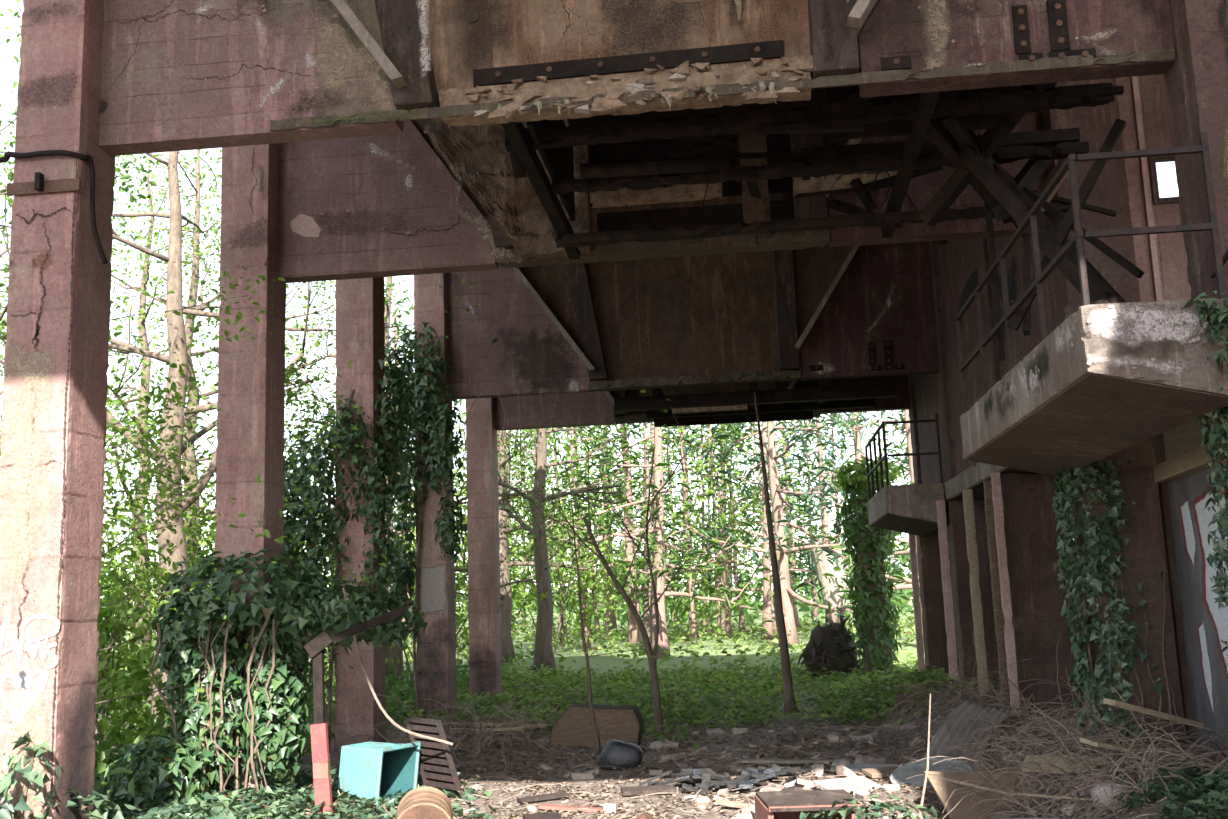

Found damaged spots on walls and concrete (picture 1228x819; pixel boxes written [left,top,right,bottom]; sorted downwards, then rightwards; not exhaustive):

crack [108,1,375,91]
water stain [458,0,508,73]
crack [559,0,606,44]
water stain [603,0,743,56]
spalling [741,55,813,104]
spalling [423,60,720,263]
peeling [1056,305,1209,351]
peeling [1087,357,1183,373]
crack [0,150,78,786]